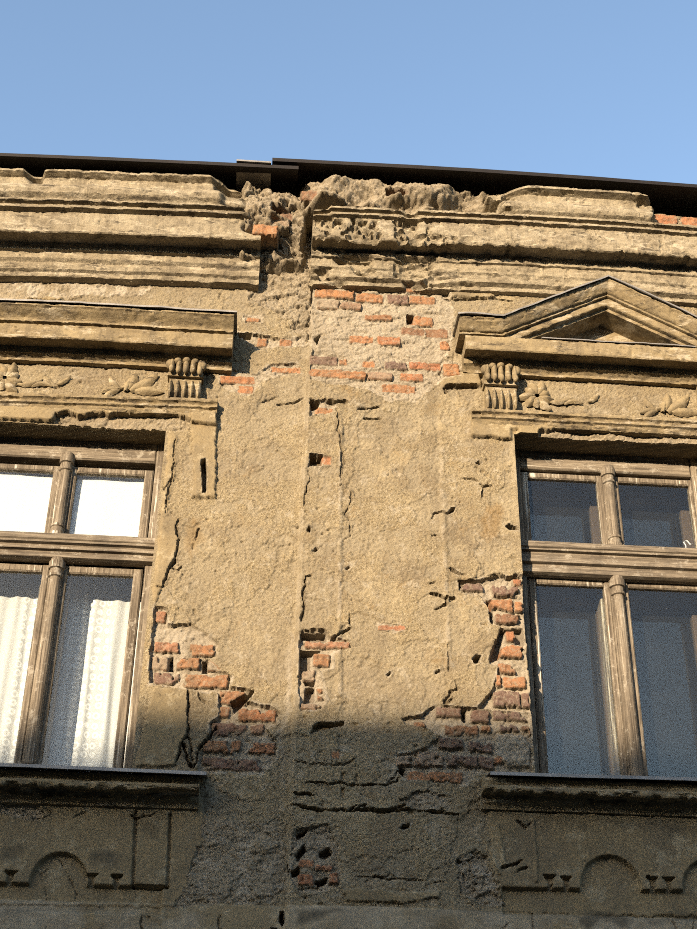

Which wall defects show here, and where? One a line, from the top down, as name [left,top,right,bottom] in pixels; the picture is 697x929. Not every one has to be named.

spalling [217,175,499,418]
crack [262,395,306,406]
crack [302,470,311,509]
crack [327,397,382,545]
crack [174,690,218,771]
spalling [146,602,283,776]
crack [299,573,312,623]
spalling [294,626,354,736]
crack [330,613,354,642]
spalling [394,573,535,812]
spalling [174,816,345,929]